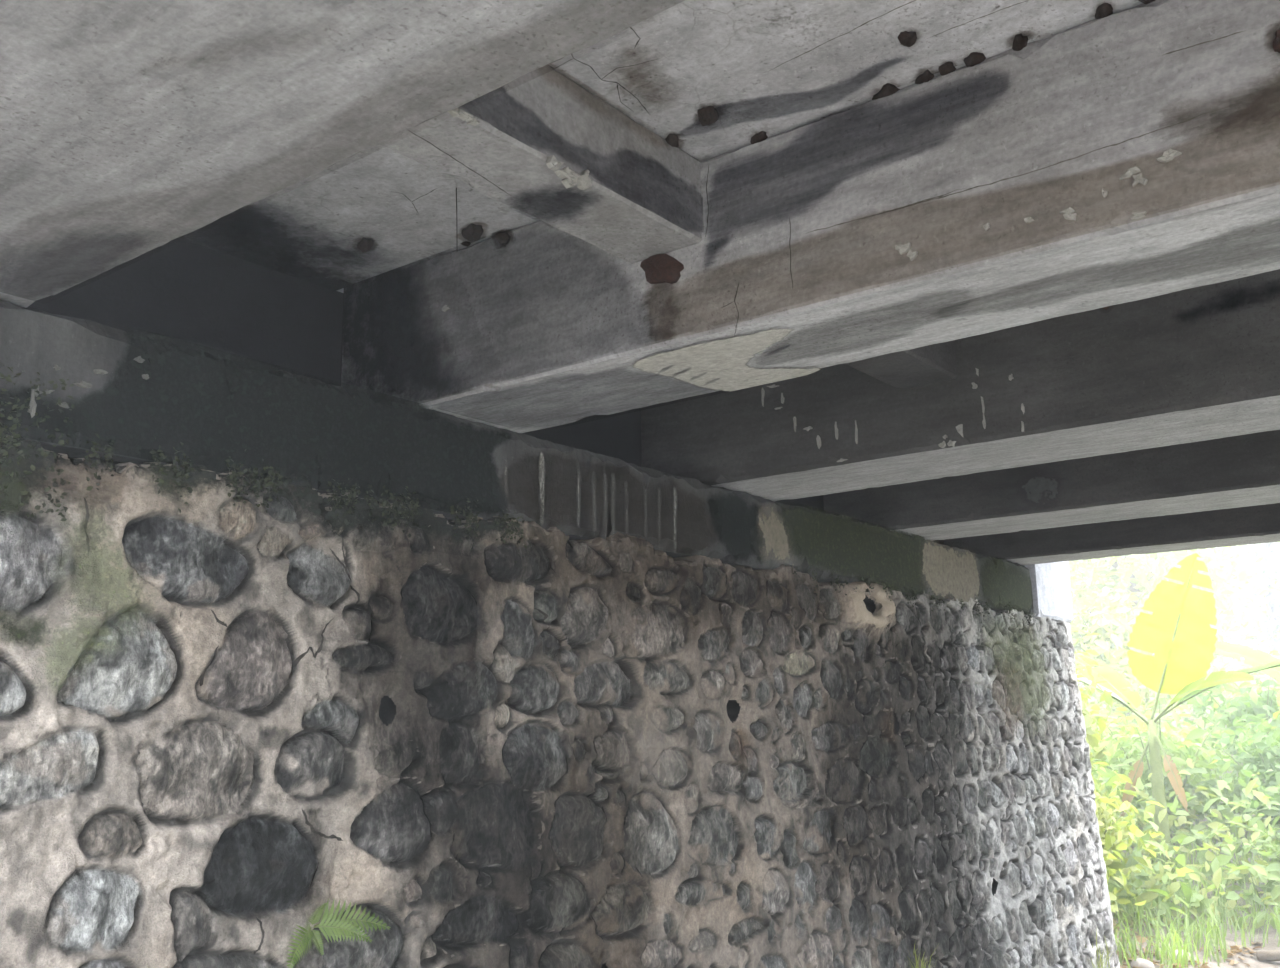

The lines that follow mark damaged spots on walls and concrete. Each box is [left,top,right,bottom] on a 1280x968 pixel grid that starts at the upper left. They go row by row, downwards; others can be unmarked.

crack [548,27,657,112]
rust [872,83,900,100]
rust [898,31,917,47]
rust [915,52,986,84]
rust [1095,3,1113,19]
water stain [712,76,1005,199]
water stain [497,87,843,266]
rust [640,254,684,314]
water stain [1177,286,1280,320]
peeling [633,329,820,392]
water stain [605,467,766,564]
water stain [0,205,592,968]